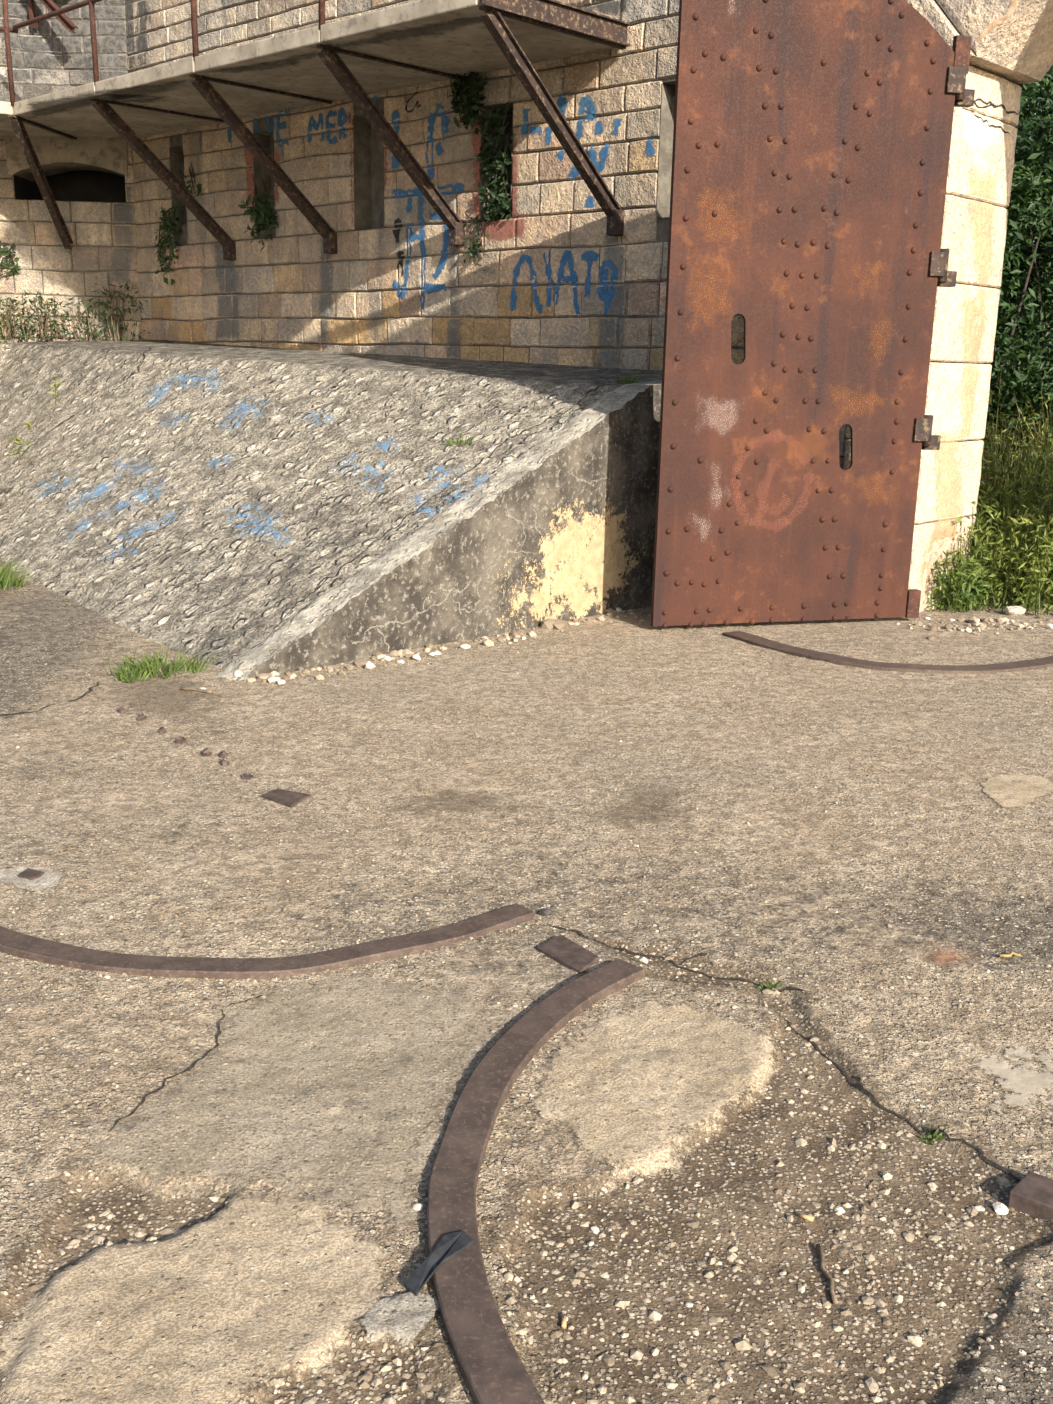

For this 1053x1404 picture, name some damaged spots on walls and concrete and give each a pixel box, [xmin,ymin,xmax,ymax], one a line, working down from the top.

peeling [487,484,648,630]
crack [0,682,99,715]
crack [108,992,275,1133]
crack [551,925,1021,1183]